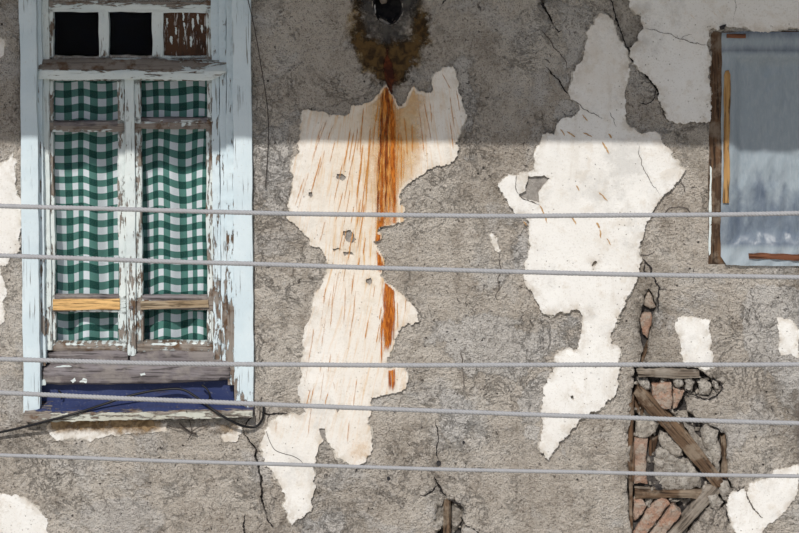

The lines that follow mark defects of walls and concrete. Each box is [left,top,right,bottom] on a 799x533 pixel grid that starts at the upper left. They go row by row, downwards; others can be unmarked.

peeling [258,66,473,525]
corrosion [334,87,432,265]
corrosion [373,283,406,360]
peeling [498,0,799,460]
crack [243,411,287,527]
spalling [433,498,477,533]
spalling [627,289,799,533]